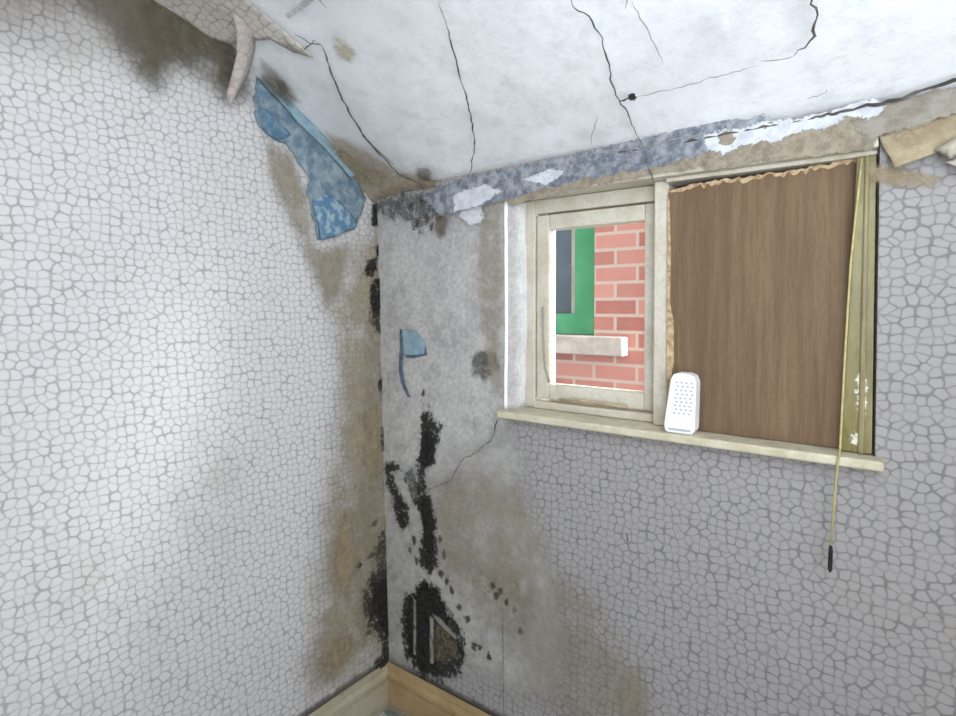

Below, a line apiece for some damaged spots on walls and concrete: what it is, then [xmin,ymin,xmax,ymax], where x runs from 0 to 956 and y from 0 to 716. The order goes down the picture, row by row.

water stain [90,0,237,86]
water stain [270,148,307,233]
peeling [253,77,366,240]
water stain [334,40,354,61]
crack [294,34,425,191]
crack [438,2,476,176]
flaking render [453,87,956,213]
peeling [399,329,427,397]
water stain [307,137,558,692]